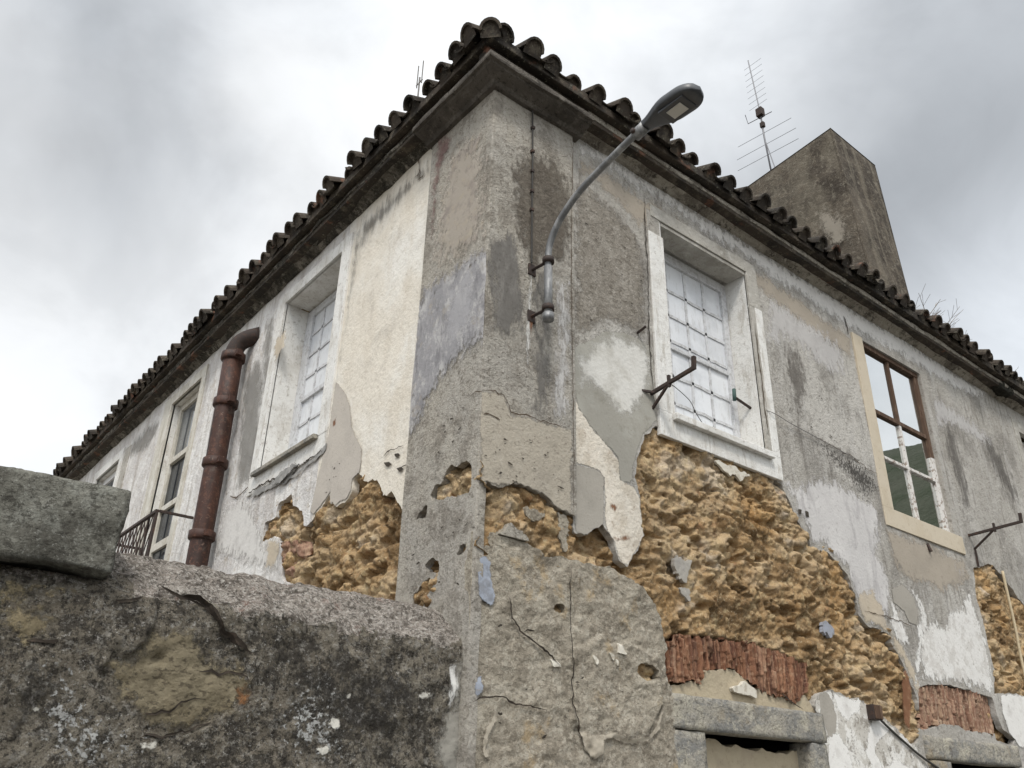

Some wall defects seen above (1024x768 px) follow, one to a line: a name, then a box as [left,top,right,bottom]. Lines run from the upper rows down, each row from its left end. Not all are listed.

crack [474,144,575,498]
water stain [487,155,651,415]
flaking render [215,384,440,607]
crack [473,696,545,710]
crack [509,573,591,759]
flaking render [437,392,1024,768]